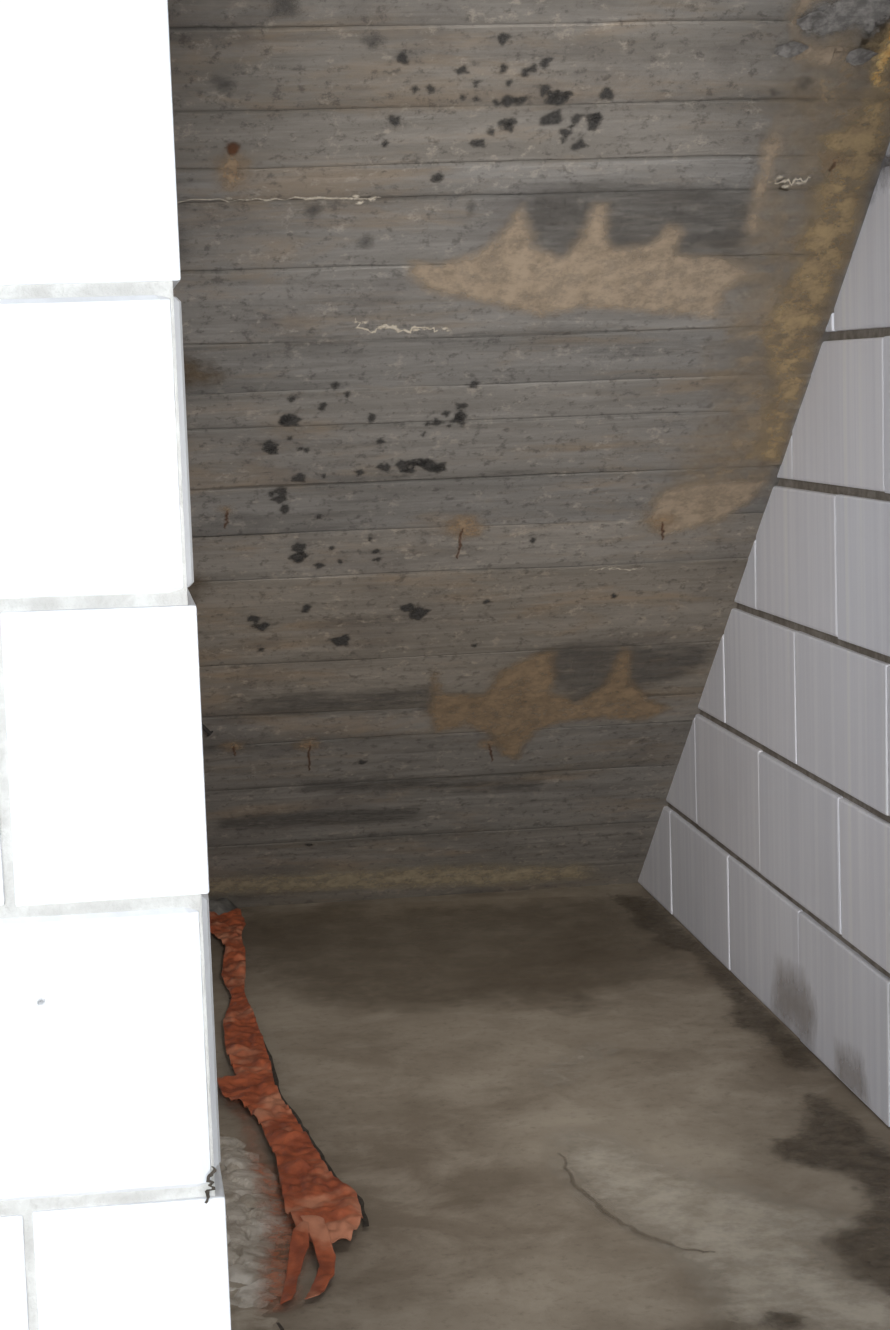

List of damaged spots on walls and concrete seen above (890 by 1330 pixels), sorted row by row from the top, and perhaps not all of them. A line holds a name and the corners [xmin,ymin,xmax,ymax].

spalling [774,0,890,66]
leakage [411,0,874,535]
leakage [567,1094,890,1330]